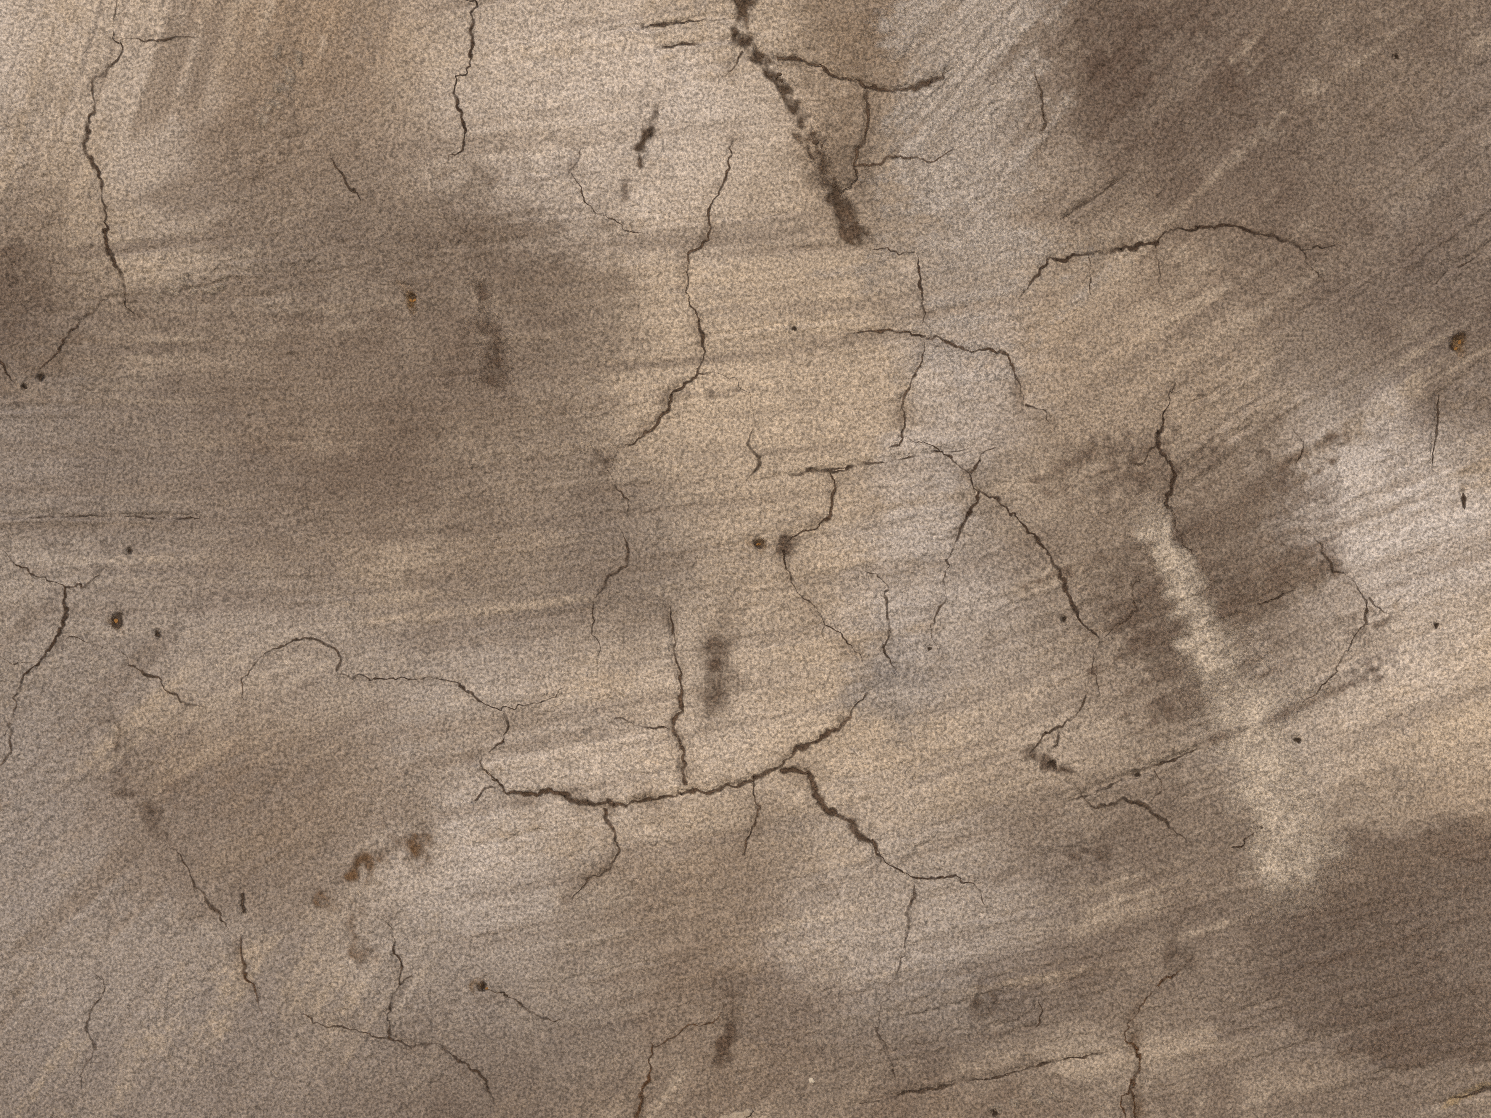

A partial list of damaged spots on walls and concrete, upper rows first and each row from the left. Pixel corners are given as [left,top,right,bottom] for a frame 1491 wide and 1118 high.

crack [0,5,192,380]
crack [448,0,478,159]
crack [576,151,640,233]
crack [591,143,761,654]
crack [854,247,1140,751]
crack [1034,72,1047,147]
crack [1021,223,1336,295]
crack [240,473,985,970]